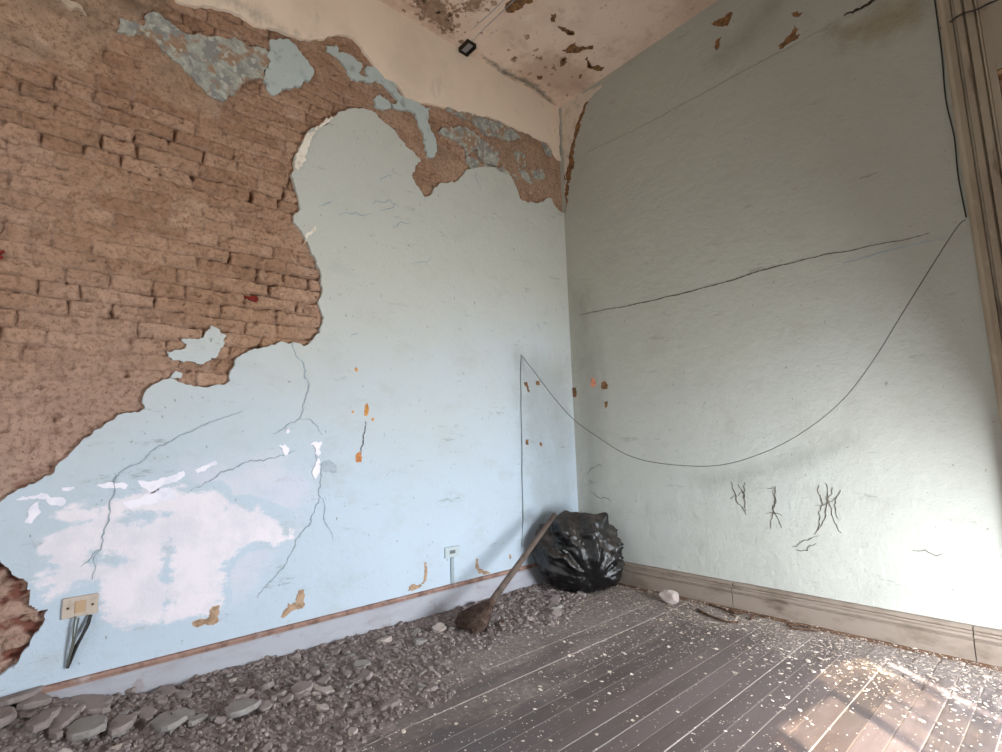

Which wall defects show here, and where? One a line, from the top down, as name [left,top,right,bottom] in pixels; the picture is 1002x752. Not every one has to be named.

leakage [414,0,484,33]
peeling [507,14,604,86]
peeling [711,12,733,50]
crack [587,0,875,153]
peeling [779,11,802,49]
crack [581,233,947,315]
flaking render [0,0,588,674]
crack [81,412,240,579]
crack [191,343,333,598]